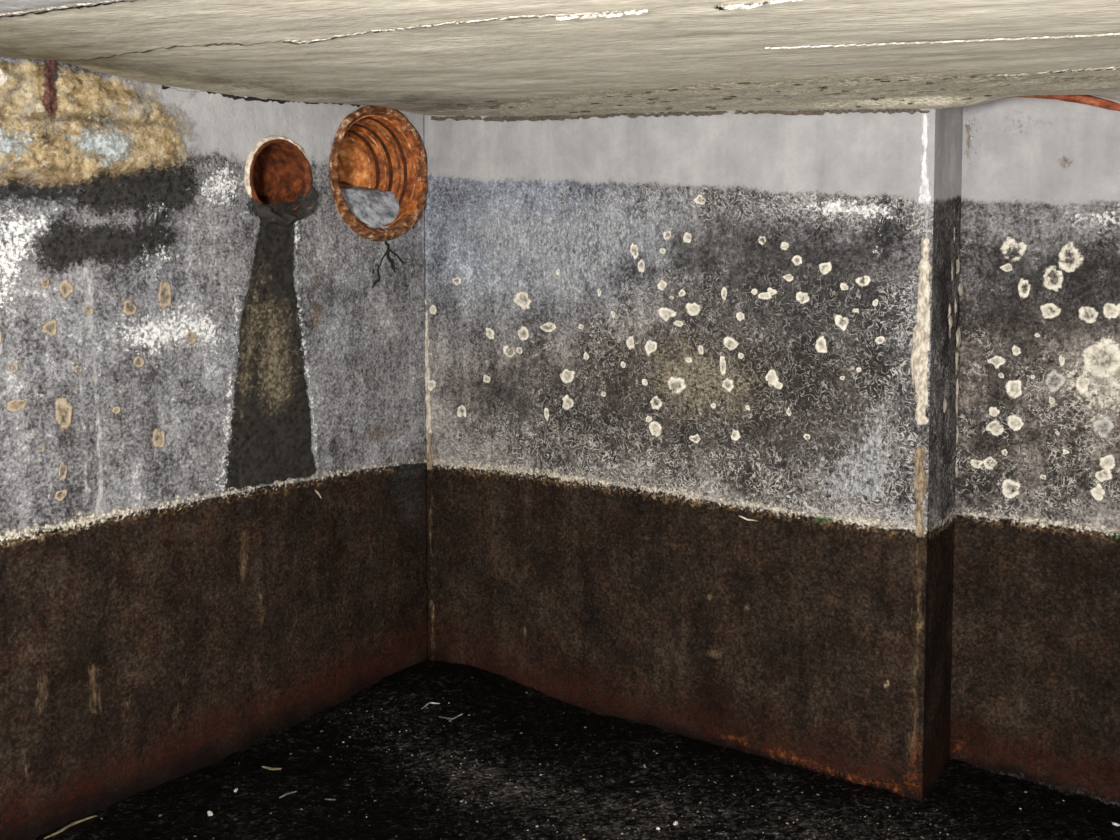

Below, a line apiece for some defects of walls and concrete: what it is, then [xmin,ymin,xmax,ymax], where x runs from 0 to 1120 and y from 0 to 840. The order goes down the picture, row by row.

crack [0,0,136,18]
crack [53,10,648,61]
crack [930,67,1120,81]
corrosion [1006,95,1120,111]
flaking render [0,59,202,199]
crack [372,241,404,288]
water stain [0,113,1120,636]